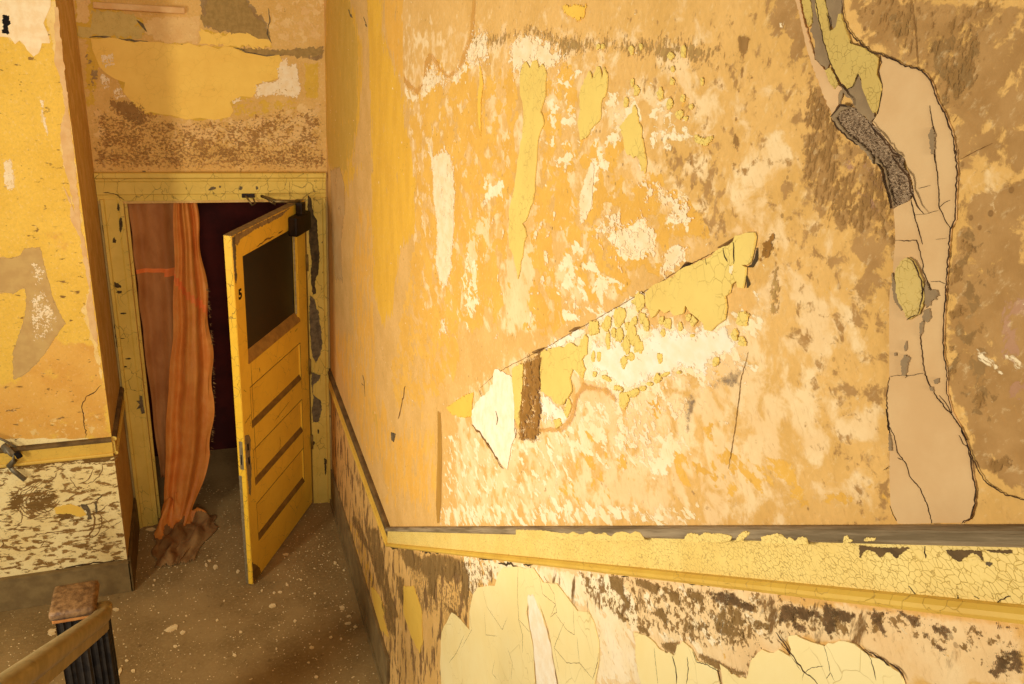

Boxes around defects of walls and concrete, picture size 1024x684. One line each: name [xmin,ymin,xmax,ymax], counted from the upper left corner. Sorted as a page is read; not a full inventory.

peeling [89,0,323,120]
peeling [0,0,98,350]
damp [94,98,345,282]
peeling [532,78,758,473]
spalling [795,0,976,524]
crack [815,0,1024,558]
spalling [447,363,524,469]
crack [728,353,748,469]
peeling [440,558,600,684]
peeling [634,632,905,684]
peeling [843,535,909,558]
peeling [946,550,1012,567]